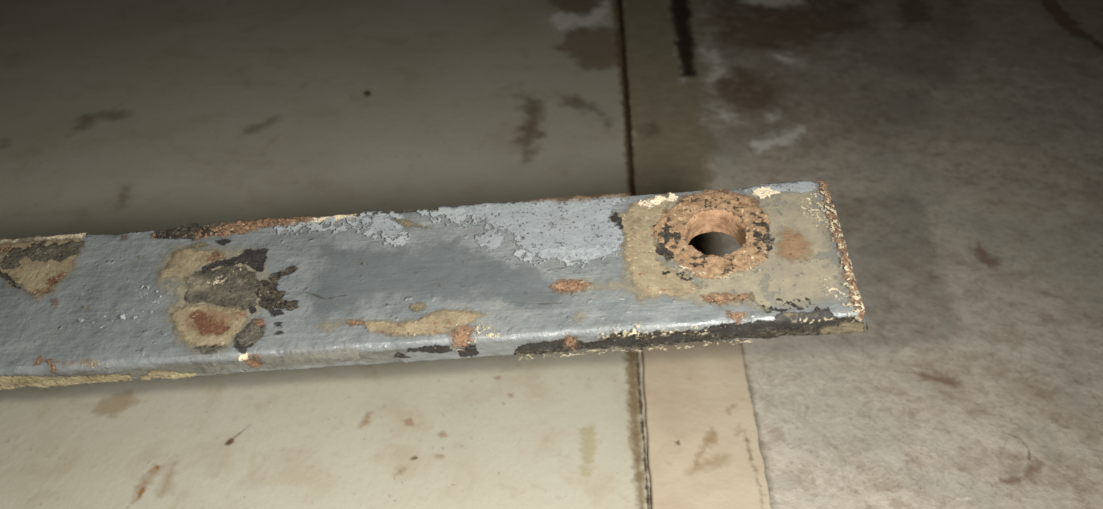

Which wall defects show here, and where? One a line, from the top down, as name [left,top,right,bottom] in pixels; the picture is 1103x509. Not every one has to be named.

peeling [0,236,85,299]
peeling [158,238,266,348]
corrosion [151,216,316,369]
peeling [274,180,859,358]
corrosion [550,279,590,294]
corrosion [700,293,755,324]
corrosion [651,188,810,279]